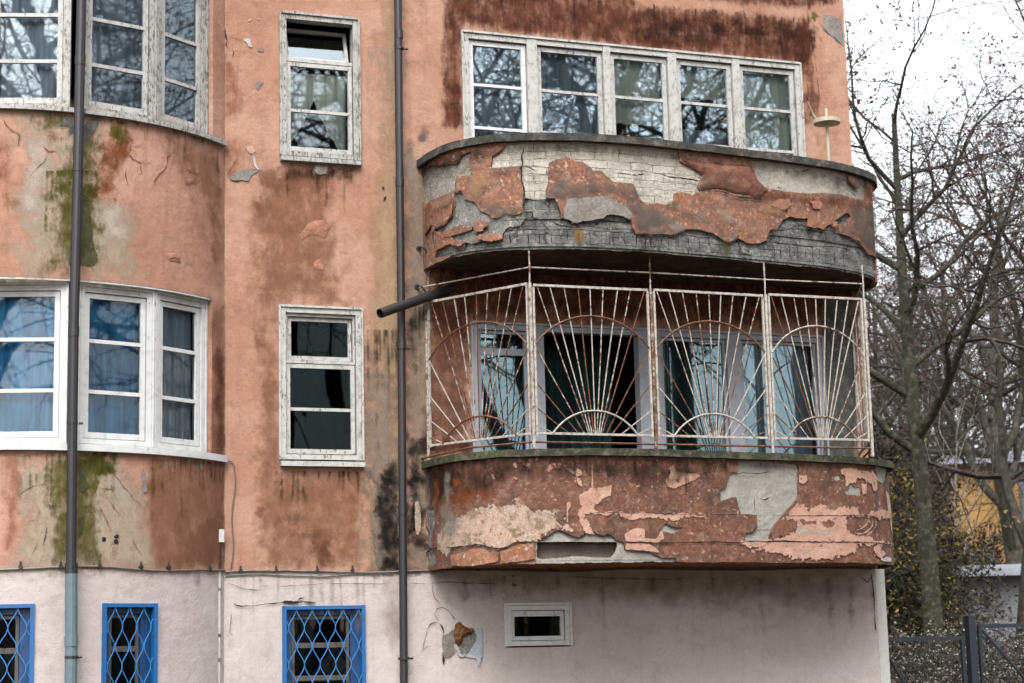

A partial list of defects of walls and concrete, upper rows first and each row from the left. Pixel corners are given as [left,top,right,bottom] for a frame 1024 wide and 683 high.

leakage [443,0,833,127]
peeling [821,15,844,45]
leakage [15,112,137,278]
crack [121,132,174,184]
peeling [230,146,259,182]
flaking render [408,142,875,282]
leakage [257,129,861,575]
leakage [10,309,224,573]
peeling [720,299,894,562]
peeling [415,462,707,567]
flaking render [428,622,483,667]